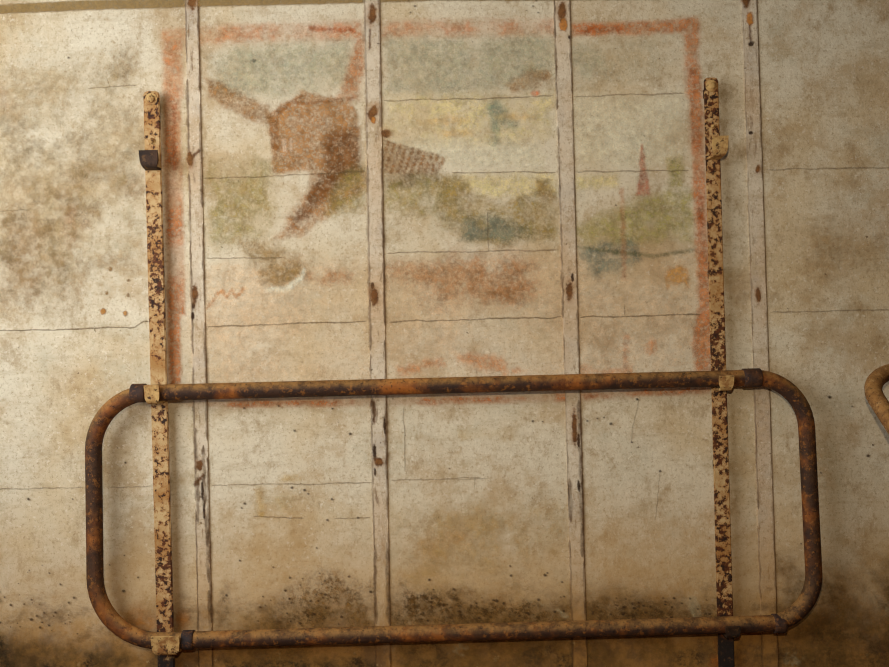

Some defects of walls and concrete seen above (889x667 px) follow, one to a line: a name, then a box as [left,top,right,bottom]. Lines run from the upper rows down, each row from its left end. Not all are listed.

rust [368,5,376,48]
rust [558,2,570,39]
rust [742,0,754,46]
rust [368,106,377,123]
rust [572,411,580,447]
leakage [392,594,562,625]